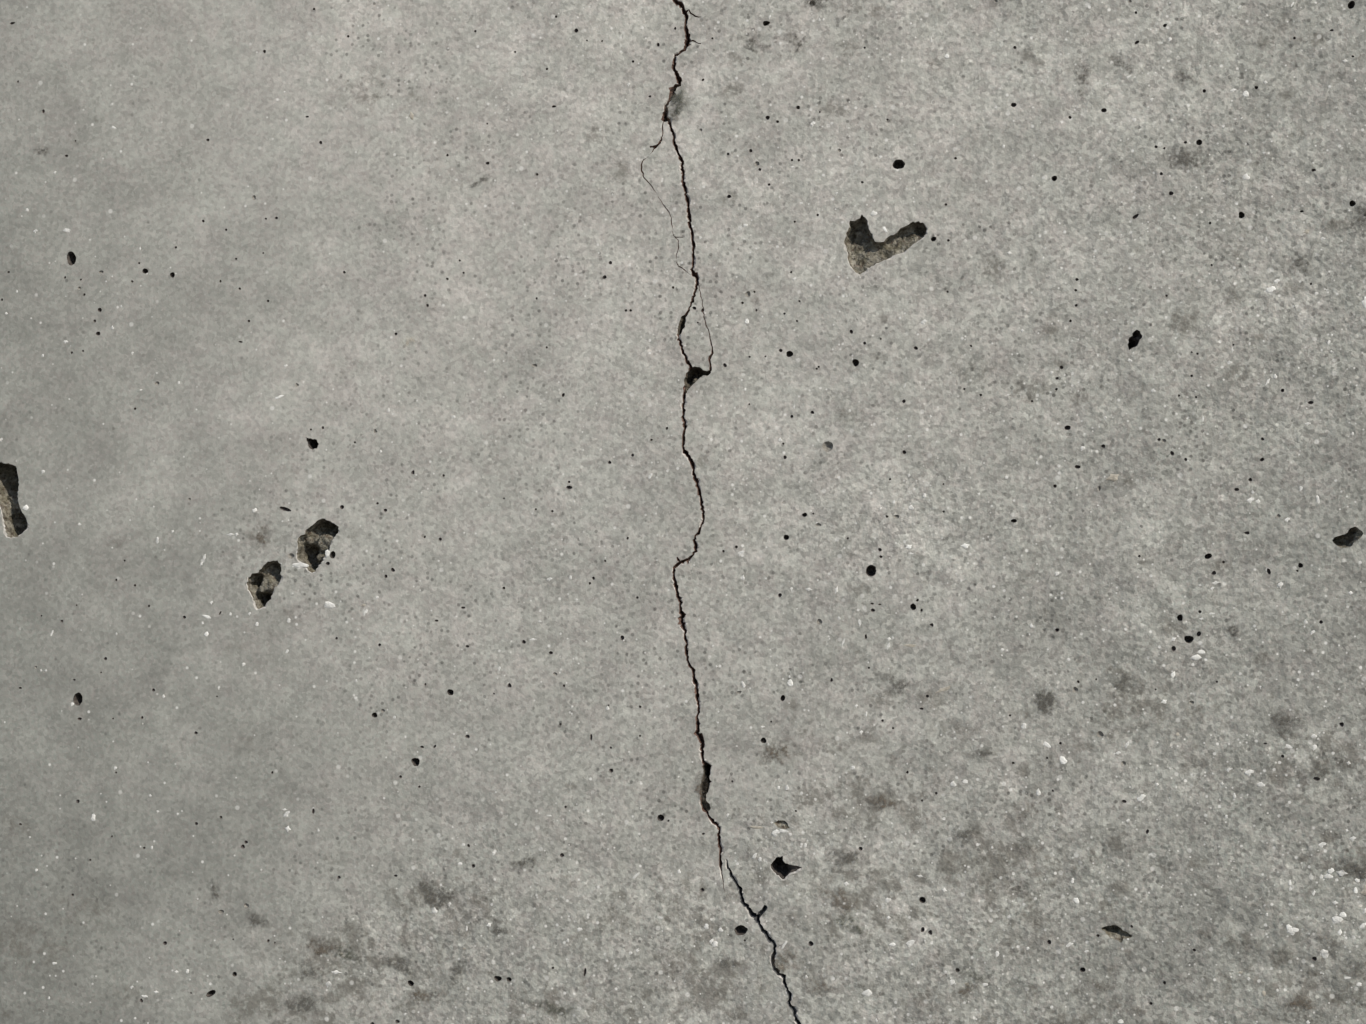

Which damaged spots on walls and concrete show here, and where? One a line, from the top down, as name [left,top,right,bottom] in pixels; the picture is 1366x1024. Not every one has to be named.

spalling [843,215,928,277]
spalling [0,462,30,539]
crack [641,0,801,1024]
spalling [246,518,340,610]